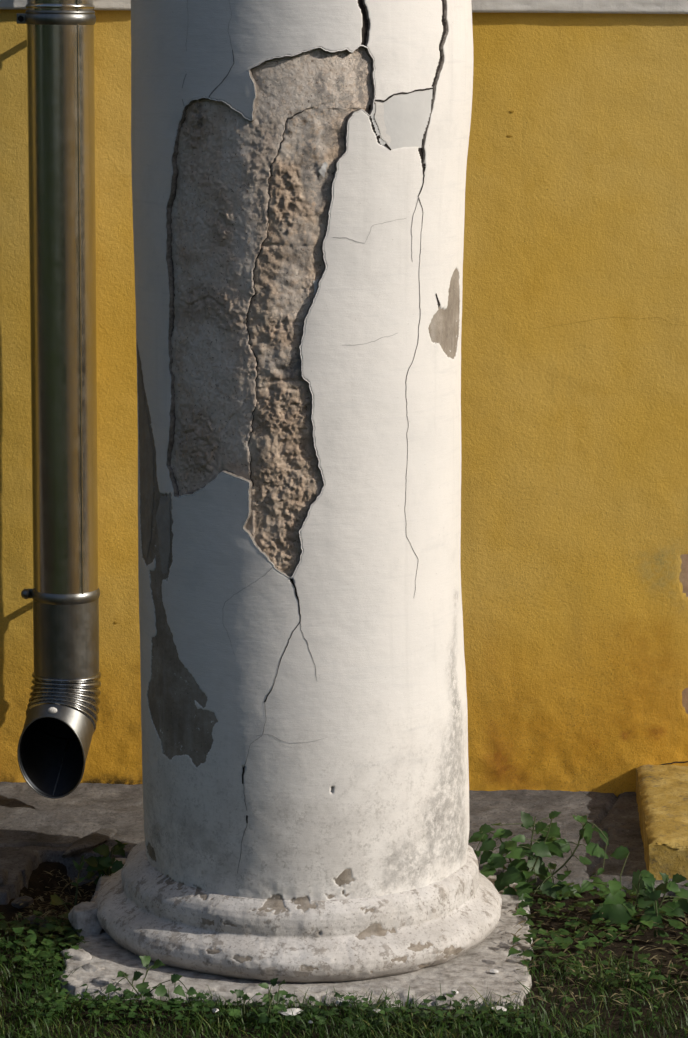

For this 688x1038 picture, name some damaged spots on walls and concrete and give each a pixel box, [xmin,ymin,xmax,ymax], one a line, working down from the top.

crack [358,0,368,46]
crack [368,0,446,150]
crack [333,131,440,474]
peeling [428,268,460,359]
spalling [137,45,376,767]
peeling [679,554,688,597]
crack [223,567,327,873]
peeling [252,894,317,915]
peeling [325,869,355,899]
peeling [355,906,396,940]
peeling [391,942,463,969]